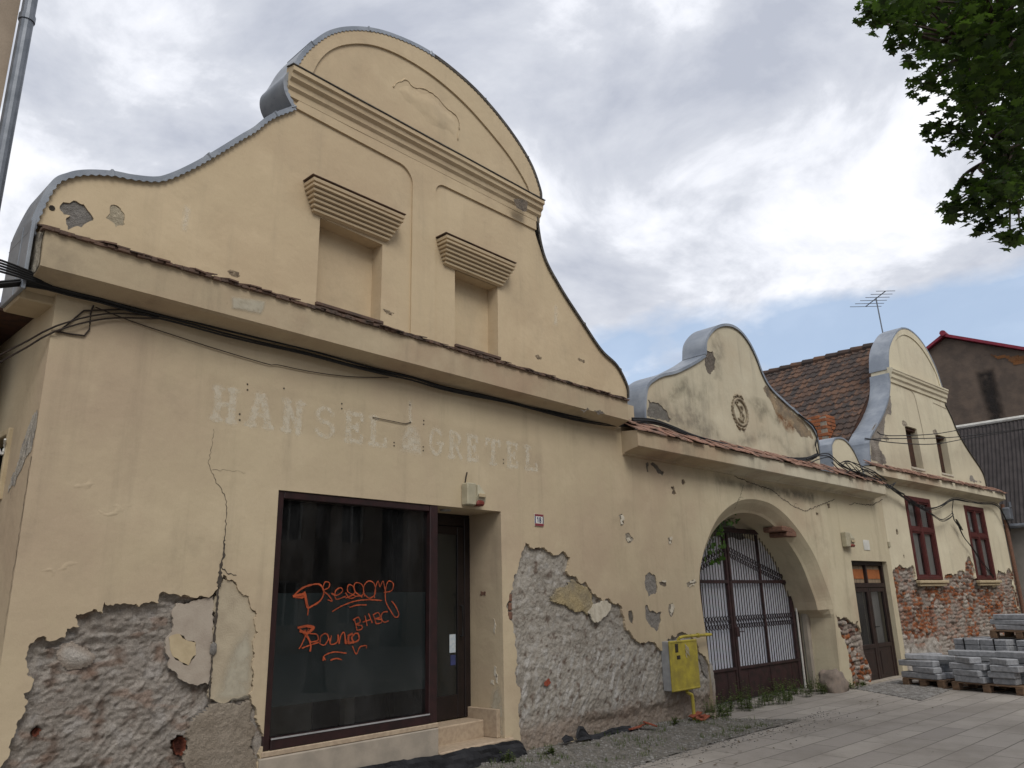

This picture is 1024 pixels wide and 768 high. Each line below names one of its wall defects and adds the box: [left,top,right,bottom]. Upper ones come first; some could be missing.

spalling [49,201,93,230]
peeling [106,205,124,227]
spalling [705,351,715,374]
spalling [647,400,670,422]
crack [208,429,234,703]
peeling [588,600,611,623]
spalling [628,572,675,631]
flaking render [173,737,186,756]